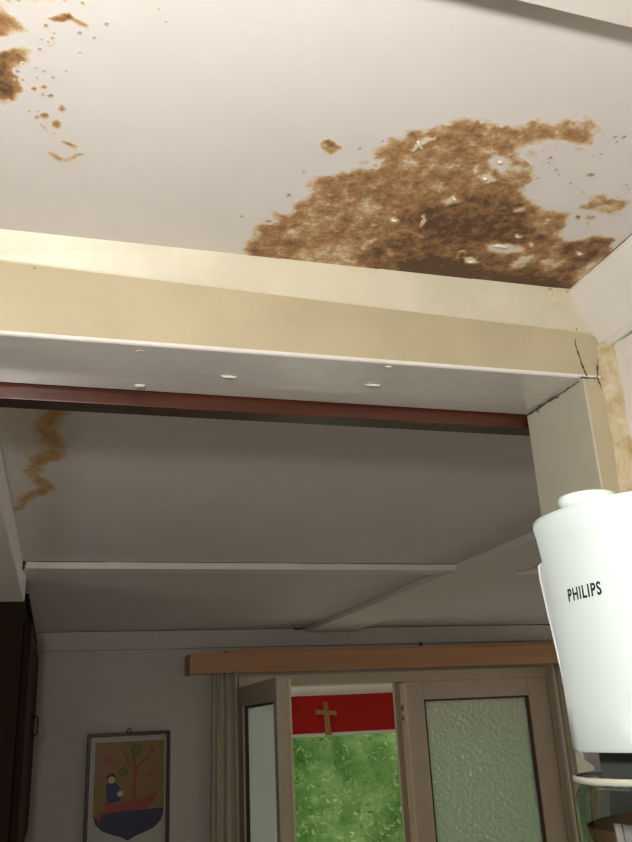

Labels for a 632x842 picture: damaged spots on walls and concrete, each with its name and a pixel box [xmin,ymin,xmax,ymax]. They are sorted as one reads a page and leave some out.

damp [0,0,112,164]
damp [238,113,632,305]
crack [527,339,602,416]
damp [0,407,73,513]